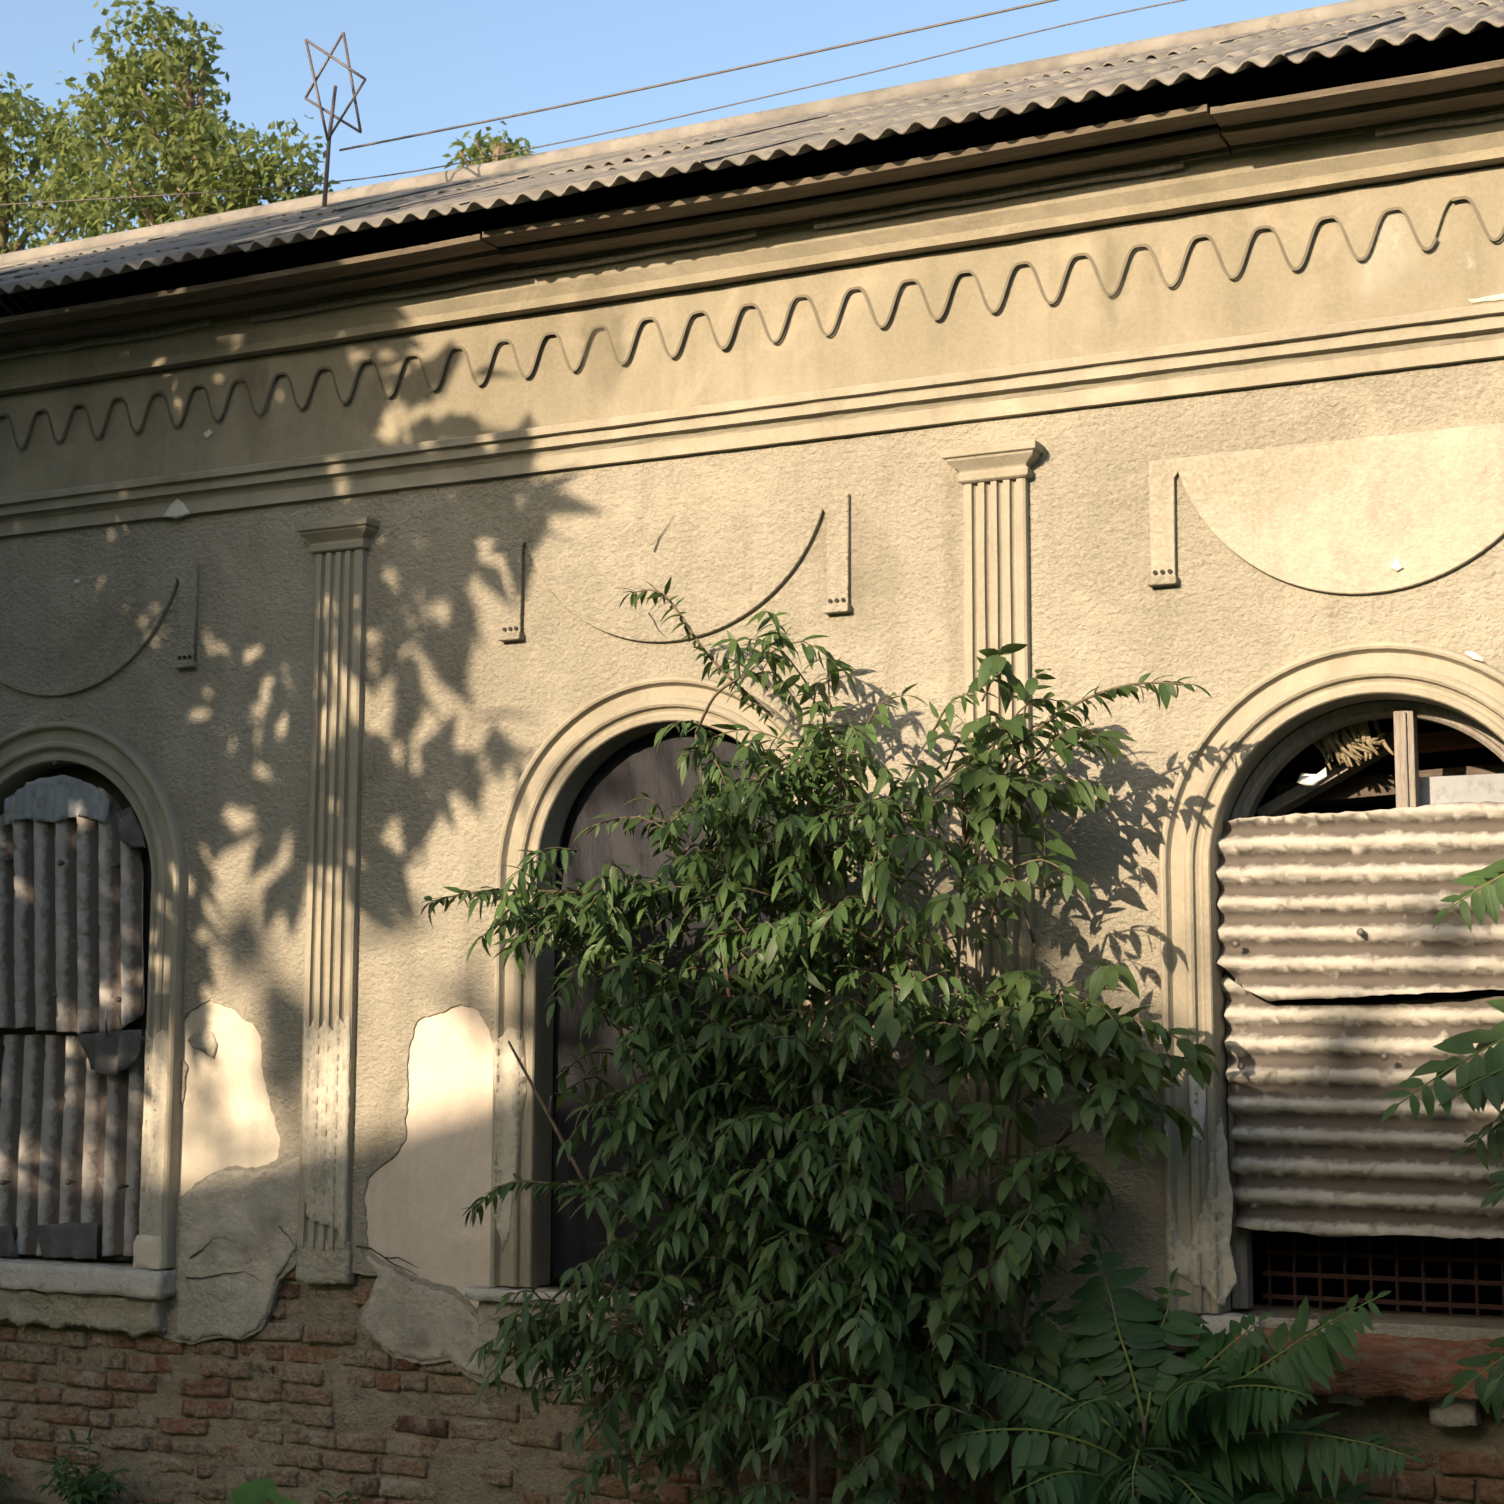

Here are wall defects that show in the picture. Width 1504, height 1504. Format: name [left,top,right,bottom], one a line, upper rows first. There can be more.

peeling [1468,293,1504,304]
peeling [139,1001,280,1236]
peeling [296,1005,854,1379]
peeling [1165,1075,1261,1338]